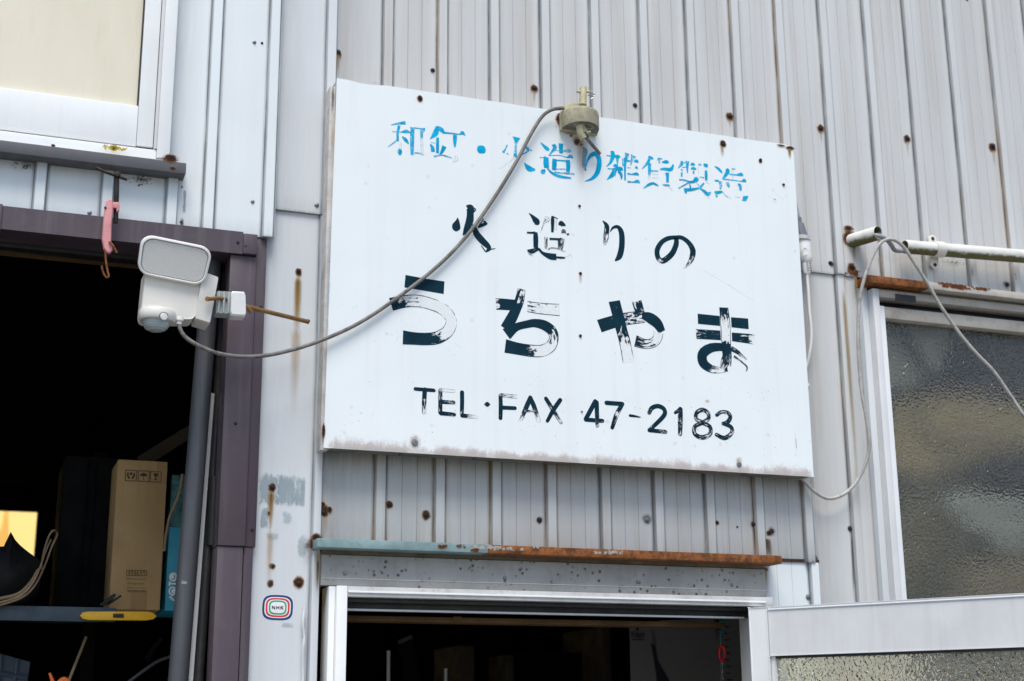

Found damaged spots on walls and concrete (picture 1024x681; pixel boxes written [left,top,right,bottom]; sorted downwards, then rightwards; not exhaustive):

rust [163,154,178,170]
rust [843,225,860,289]
rust [938,282,990,291]
rust [843,295,854,424]
rust [268,483,276,522]